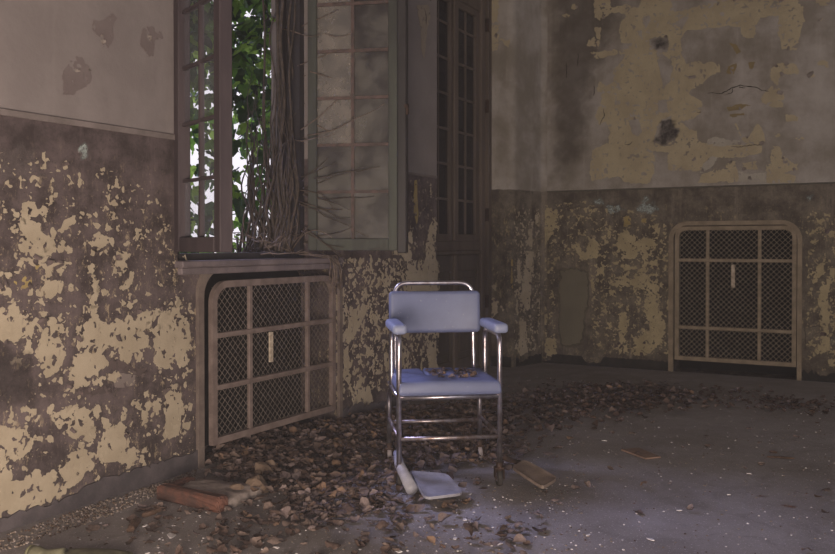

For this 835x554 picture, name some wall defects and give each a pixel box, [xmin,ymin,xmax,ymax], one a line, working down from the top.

peeling [492,0,510,51]
leakage [655,120,678,145]
peeling [587,0,805,184]
crack [710,85,766,95]
peeling [0,152,196,518]
peeling [336,179,440,406]
peeling [510,201,668,358]
peeling [806,211,835,367]